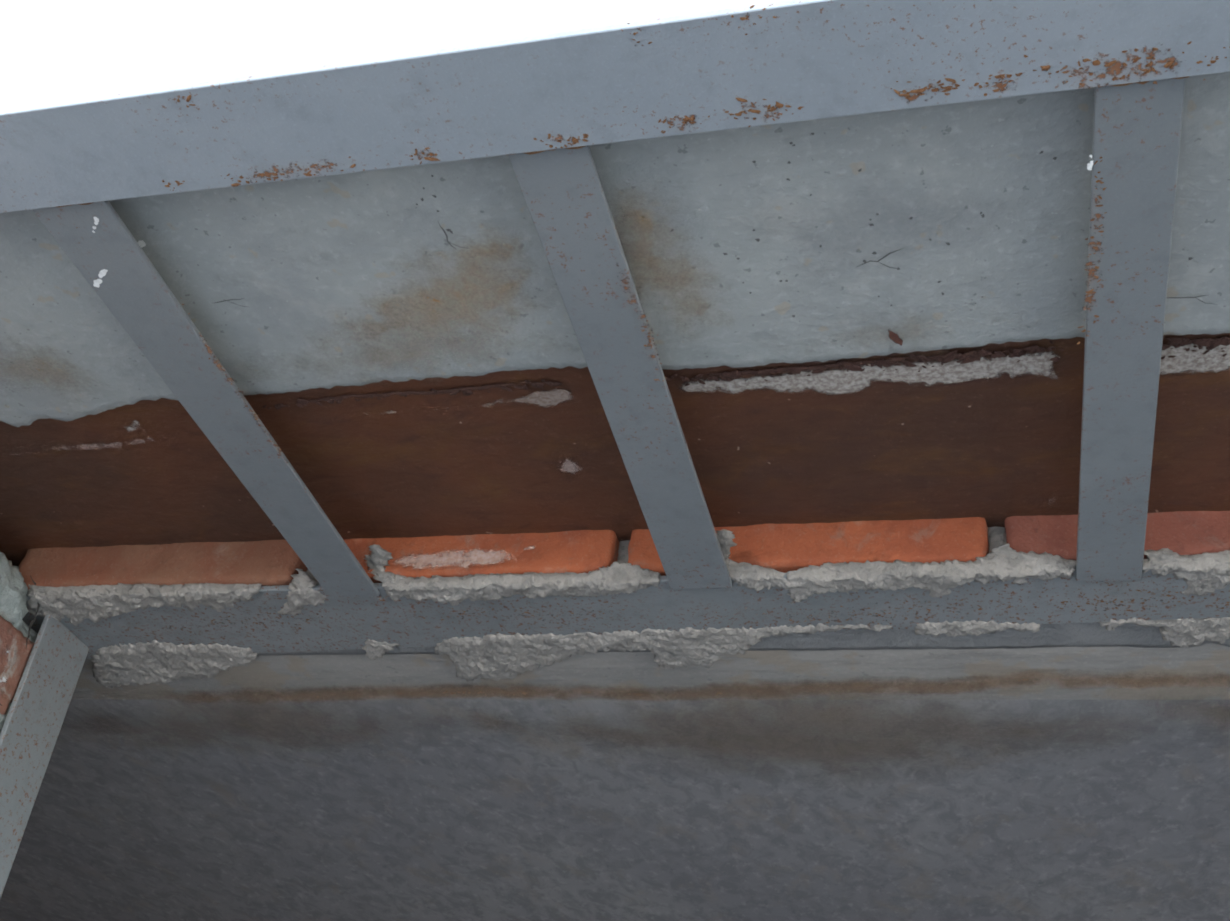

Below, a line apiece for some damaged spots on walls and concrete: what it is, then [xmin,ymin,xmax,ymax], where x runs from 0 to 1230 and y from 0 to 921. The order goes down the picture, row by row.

rust [890,42,1191,103]
rust [224,156,365,187]
rust [410,148,441,165]
rust [534,134,589,148]
rust [1077,156,1107,345]
peeling [665,341,1064,395]
peeling [1160,336,1230,375]
peeling [487,389,571,407]